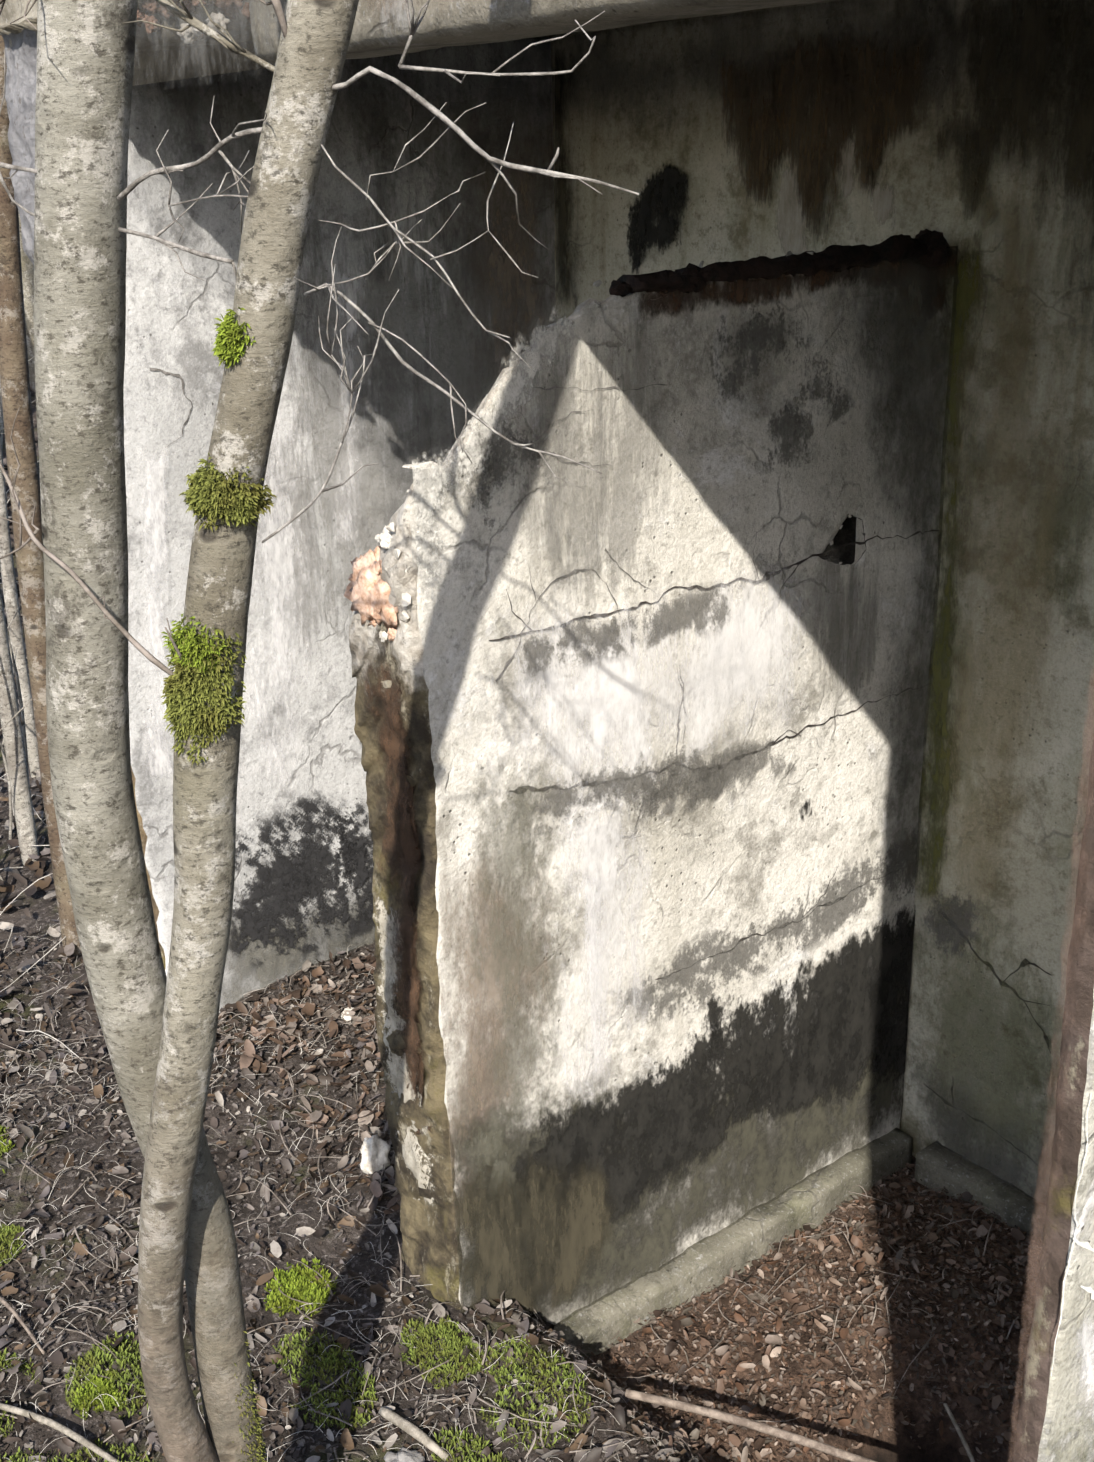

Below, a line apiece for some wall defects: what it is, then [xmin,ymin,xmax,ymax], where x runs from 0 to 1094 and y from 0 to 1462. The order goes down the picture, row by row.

water stain [720,34,924,239]
corrosion [639,246,958,317]
spalling [344,522,411,649]
crack [489,529,940,711]
water stain [624,268,949,1019]
spalling [808,498,875,580]
crack [509,665,931,794]
water stain [225,903,375,1001]
crack [945,916,1052,1054]
water stain [452,1080,633,1215]
water stain [532,1052,904,1327]
crack [1051,1093,1094,1376]